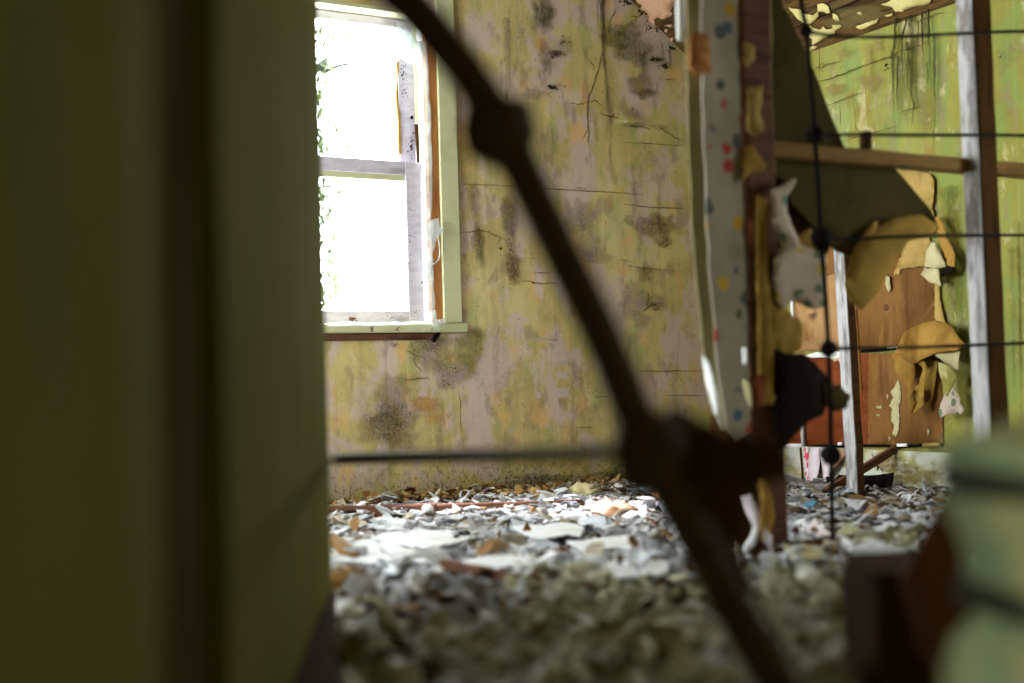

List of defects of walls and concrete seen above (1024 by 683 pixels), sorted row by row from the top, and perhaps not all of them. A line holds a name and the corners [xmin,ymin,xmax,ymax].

crack [571,9,681,146]
peeling [613,0,713,75]
peeling [789,3,842,51]
peeling [856,0,931,30]
damp [882,9,936,109]
crack [554,187,683,209]